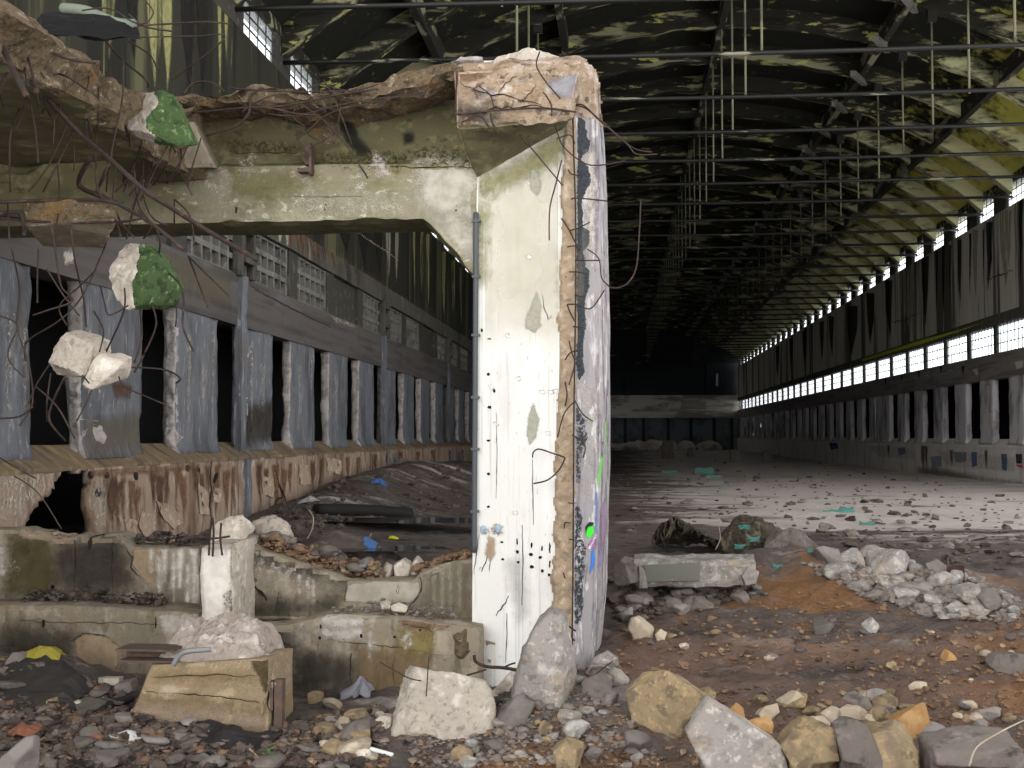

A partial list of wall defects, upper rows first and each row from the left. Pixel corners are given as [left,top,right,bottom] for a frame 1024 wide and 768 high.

spalling [82,1,230,32]
damp [339,122,369,156]
spalling [0,41,426,453]
spalling [453,51,657,649]
spalling [0,457,77,546]
rust [90,465,236,525]
rust [257,464,292,504]
rust [311,460,323,484]